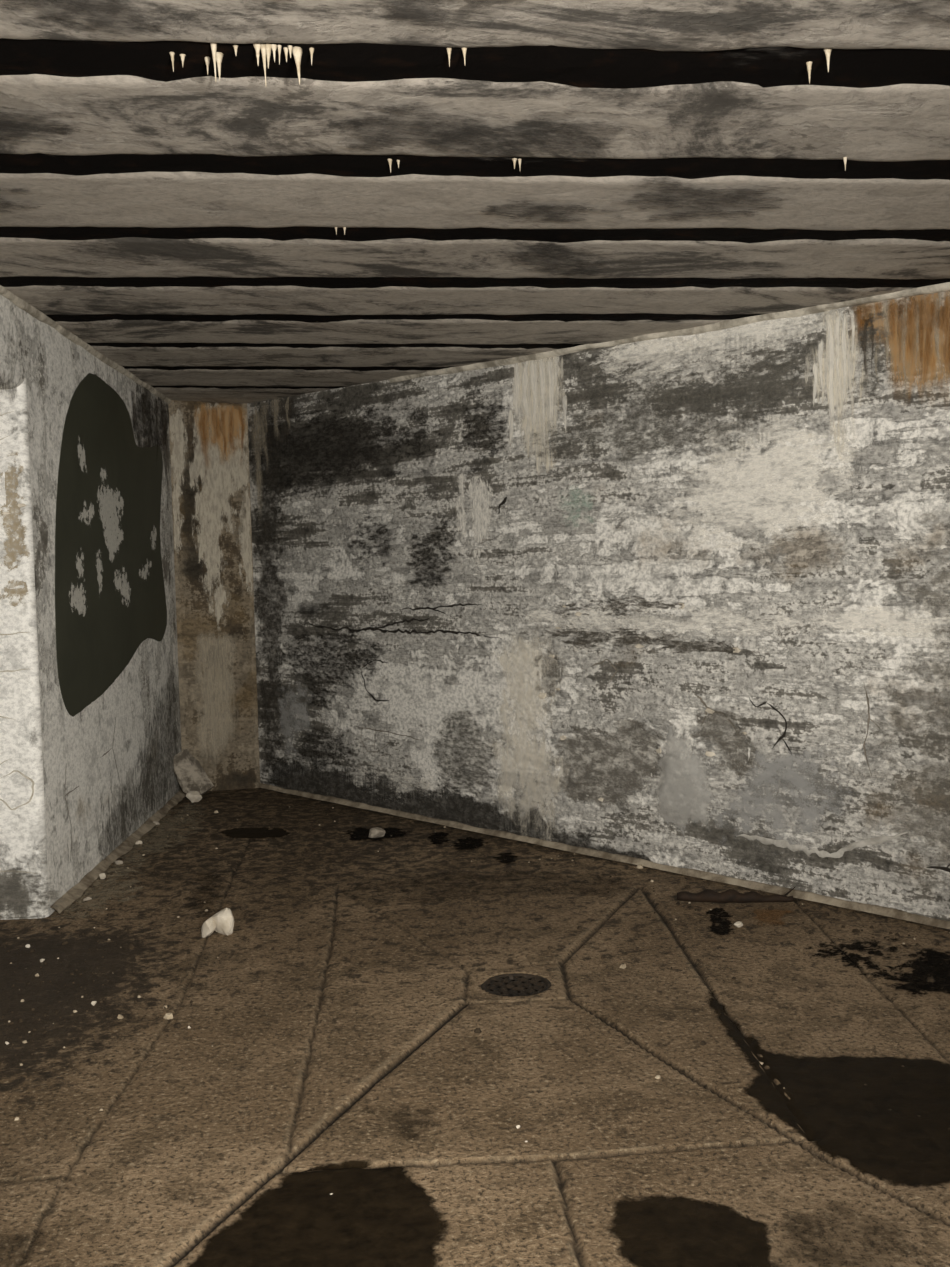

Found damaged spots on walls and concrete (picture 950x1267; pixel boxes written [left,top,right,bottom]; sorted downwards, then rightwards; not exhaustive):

peeling [55,373,167,717]
rust [189,404,249,628]
leakage [238,398,651,861]
leakage [462,310,886,548]
leakage [527,569,950,861]
rust [857,293,950,390]
leakage [708,992,950,1187]
leakage [188,1160,448,1267]
leakage [608,1195,773,1267]